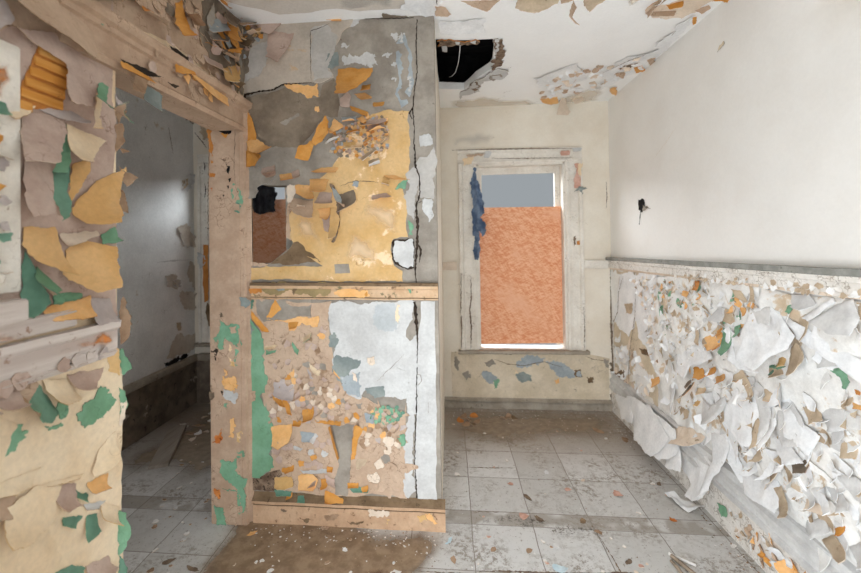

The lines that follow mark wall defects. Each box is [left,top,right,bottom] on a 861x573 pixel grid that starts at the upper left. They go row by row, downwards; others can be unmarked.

peeling [515,0,605,25]
peeling [535,0,729,115]
peeling [462,148,587,194]
peeling [0,0,509,573]
crack [368,17,422,498]
peeling [451,269,861,573]
crack [404,565,583,573]
crack [597,533,632,573]